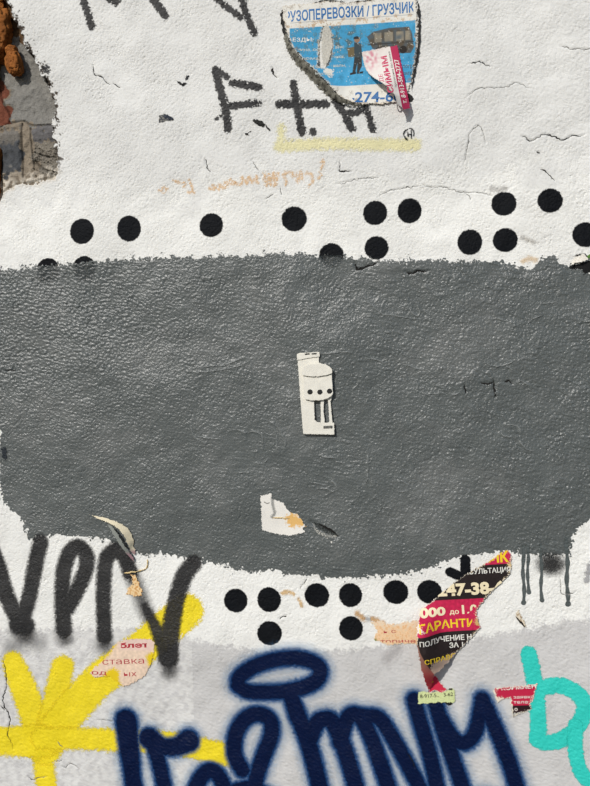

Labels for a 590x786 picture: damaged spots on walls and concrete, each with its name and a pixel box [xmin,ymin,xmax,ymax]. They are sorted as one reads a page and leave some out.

flaking render [0,0,60,201]